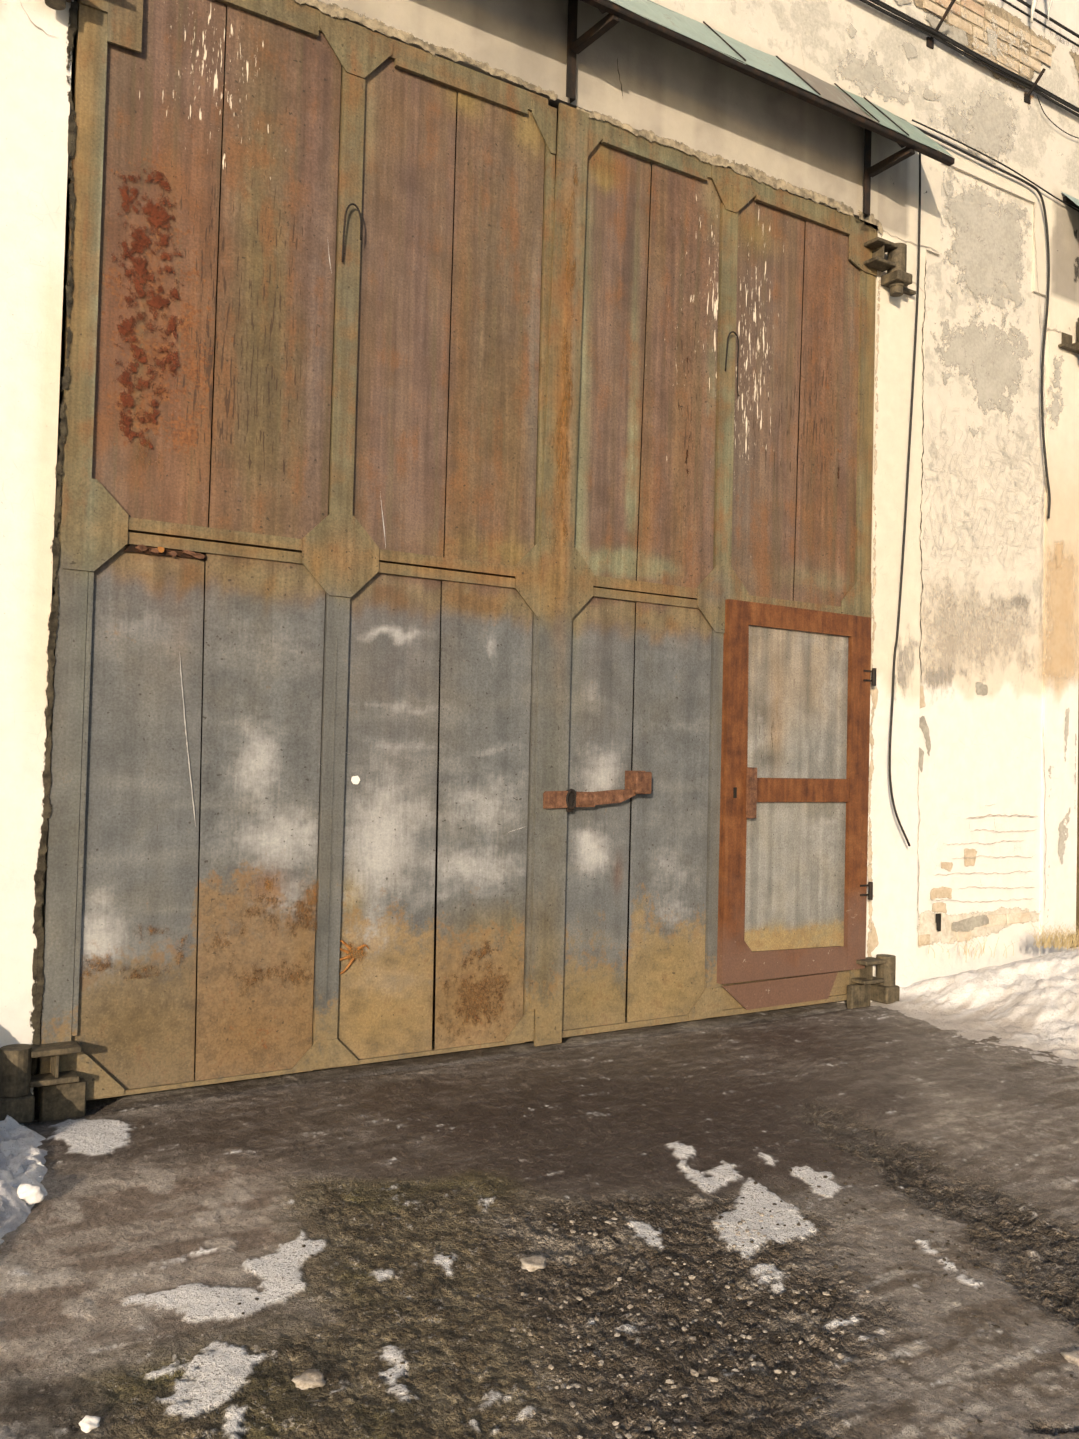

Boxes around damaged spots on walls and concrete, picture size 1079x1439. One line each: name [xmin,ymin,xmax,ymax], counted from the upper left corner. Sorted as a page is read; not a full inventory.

flaking render [835,0,1079,165]
corrosion [112,169,184,456]
peeling [930,166,1033,437]
leakage [898,543,1074,687]
flaking render [918,849,1048,948]